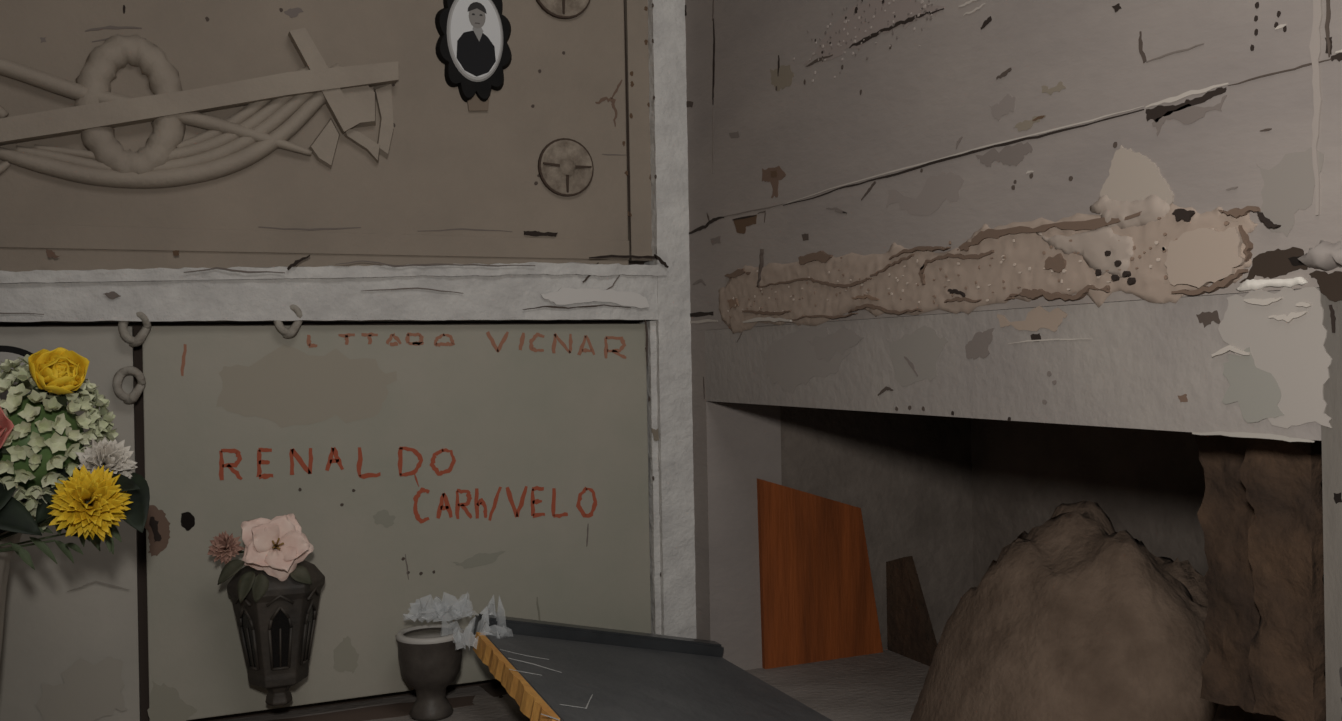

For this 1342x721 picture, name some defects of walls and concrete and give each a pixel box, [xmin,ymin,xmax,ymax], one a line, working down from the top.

crack [709,0,717,104]
crack [777,8,944,75]
crack [523,5,669,365]
crack [689,109,1144,342]
flaking render [718,203,1342,429]